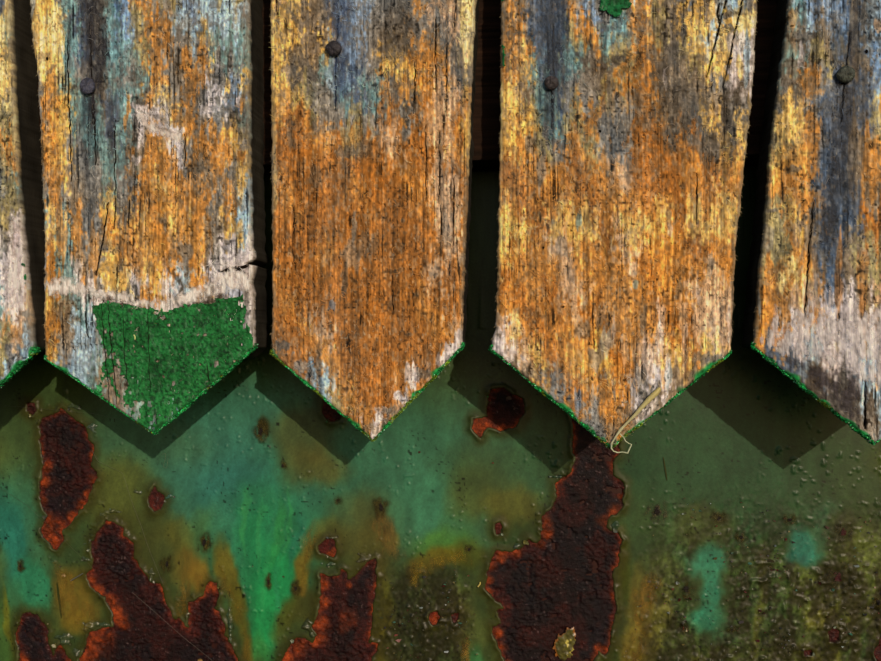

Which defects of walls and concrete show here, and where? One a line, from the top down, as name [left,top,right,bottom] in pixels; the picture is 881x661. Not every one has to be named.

crack [706,0,743,86]
rust [27,403,97,550]
rust [16,520,238,661]
rust [282,559,378,661]
rust [472,388,525,437]
rust [485,417,624,661]